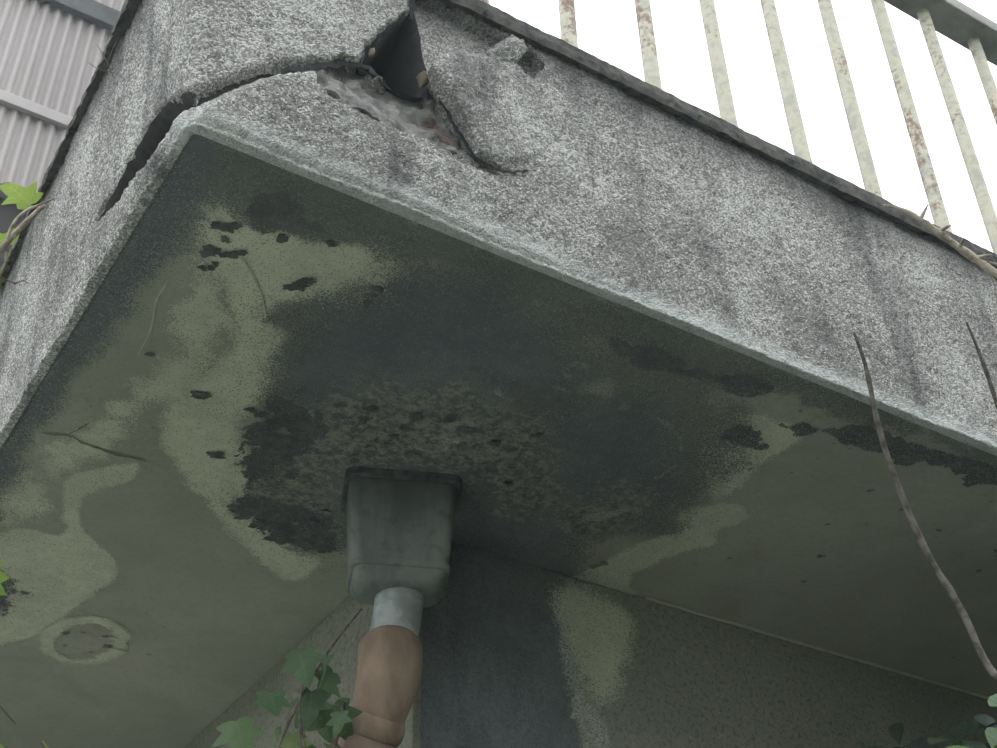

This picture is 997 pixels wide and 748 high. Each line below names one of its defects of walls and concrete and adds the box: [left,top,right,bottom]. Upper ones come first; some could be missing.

crack [98,70,301,221]
spalling [276,6,570,171]
crack [489,165,528,175]
crack [520,63,544,73]
peeling [0,186,403,646]
damp [0,134,876,748]
peeling [571,336,997,596]
damp [877,408,997,471]